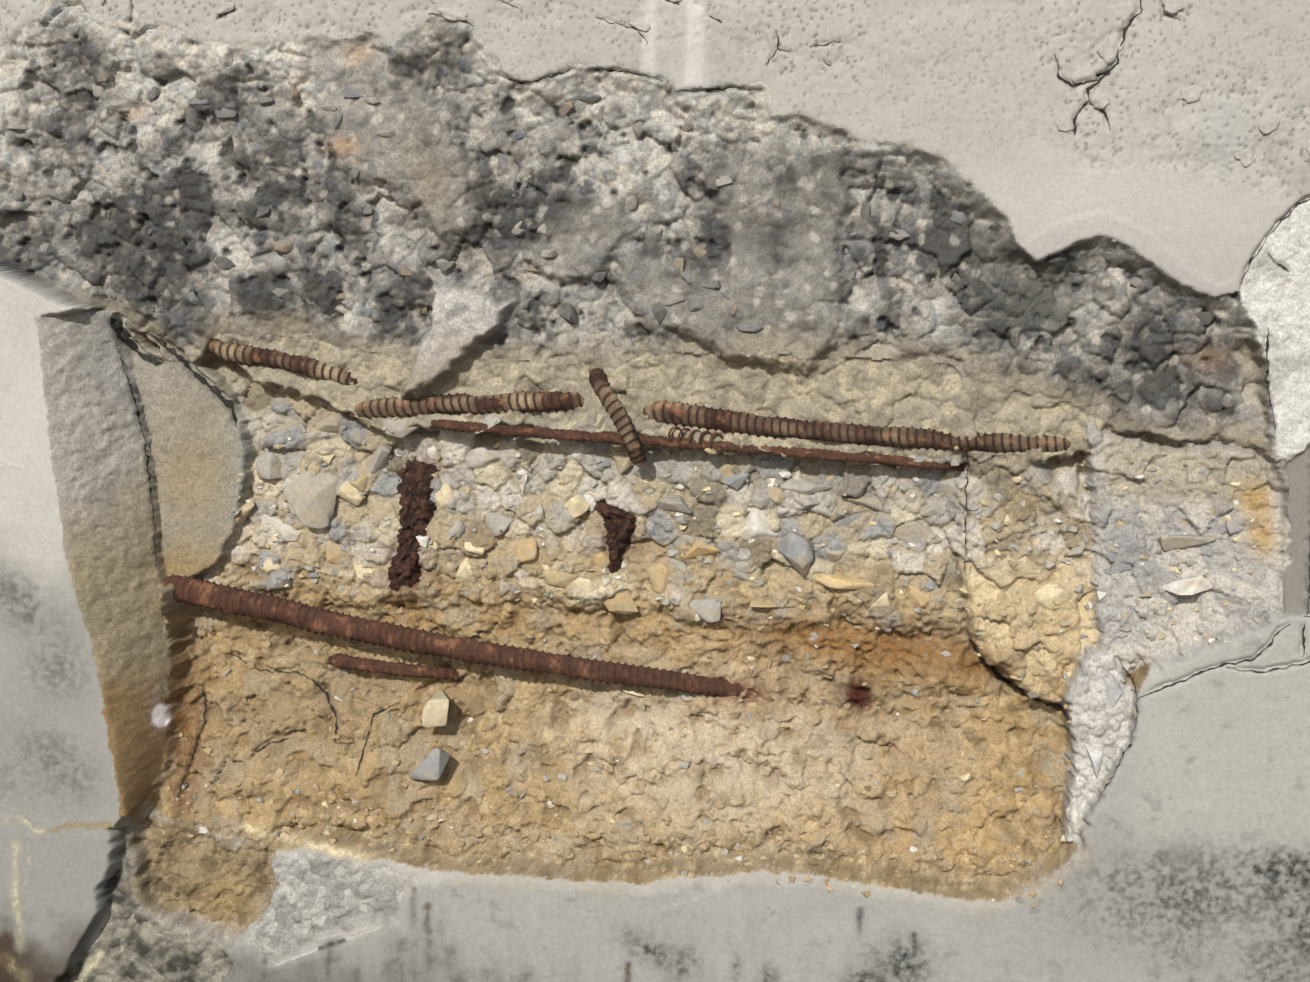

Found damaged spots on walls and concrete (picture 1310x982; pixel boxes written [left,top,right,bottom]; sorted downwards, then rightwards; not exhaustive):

crack [499,17,842,92]
crack [1054,0,1180,136]
spalling [0,0,1310,460]
crack [110,317,237,574]
spalling [35,309,256,816]
rust [388,456,440,592]
rust [595,500,637,574]
crack [231,653,400,777]
spalling [61,332,1293,982]
crack [1092,553,1310,807]
damp [1158,862,1236,927]
damp [1249,853,1310,952]